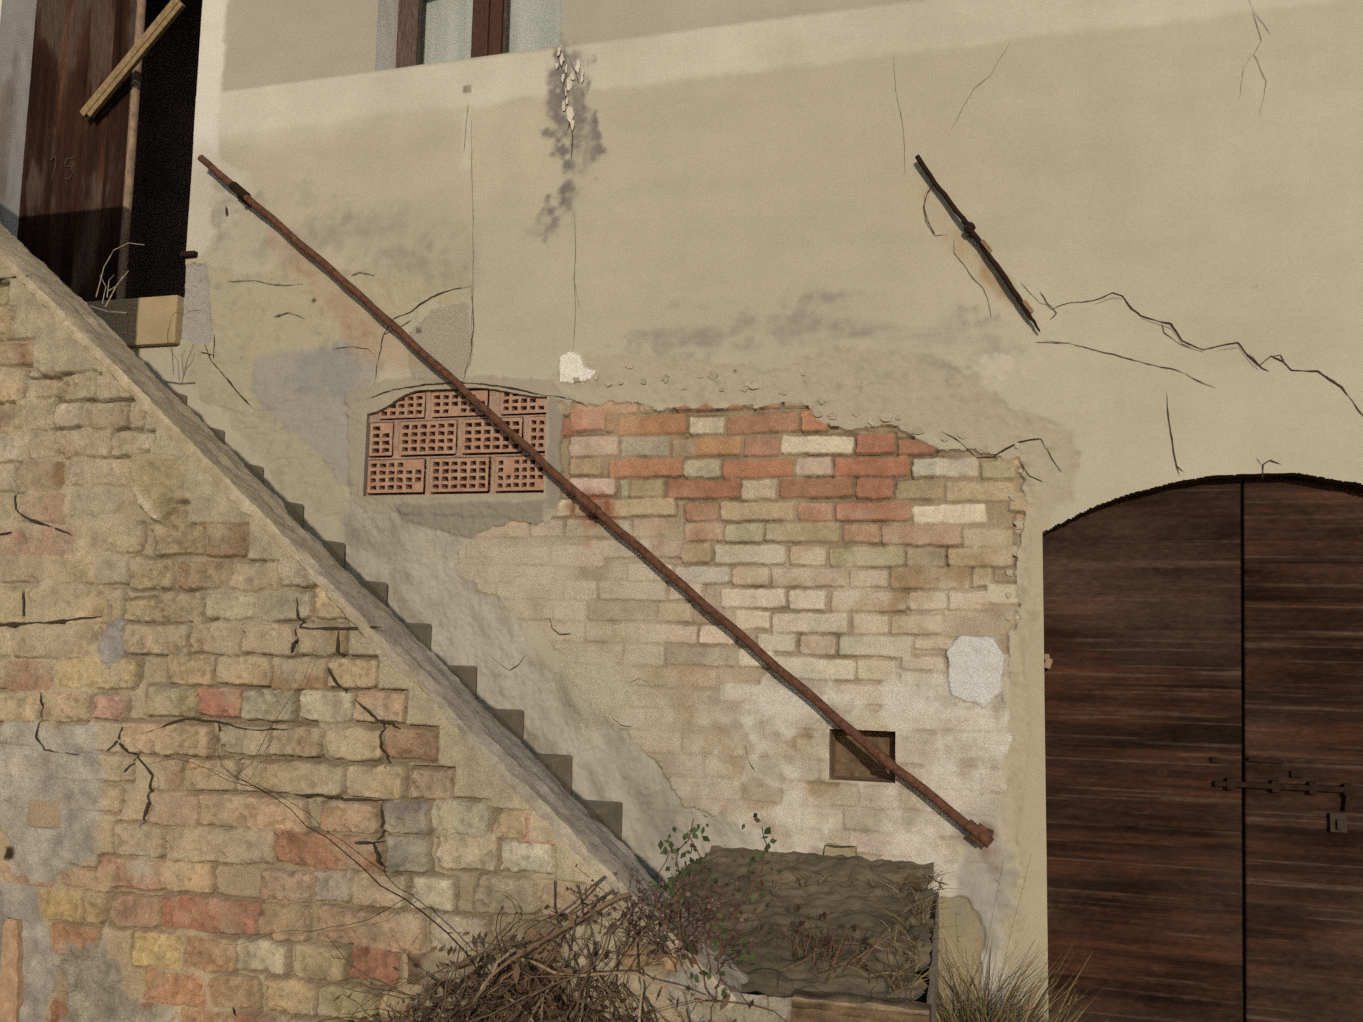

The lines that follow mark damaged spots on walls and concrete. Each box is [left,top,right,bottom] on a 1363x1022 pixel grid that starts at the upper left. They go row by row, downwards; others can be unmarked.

crack [1240,2,1269,116]
water stain [519,29,612,254]
corrosion [262,222,433,374]
corrosion [915,181,1027,312]
crack [1040,292,1363,476]
corrosion [561,485,624,552]
flaking render [456,351,1027,1022]